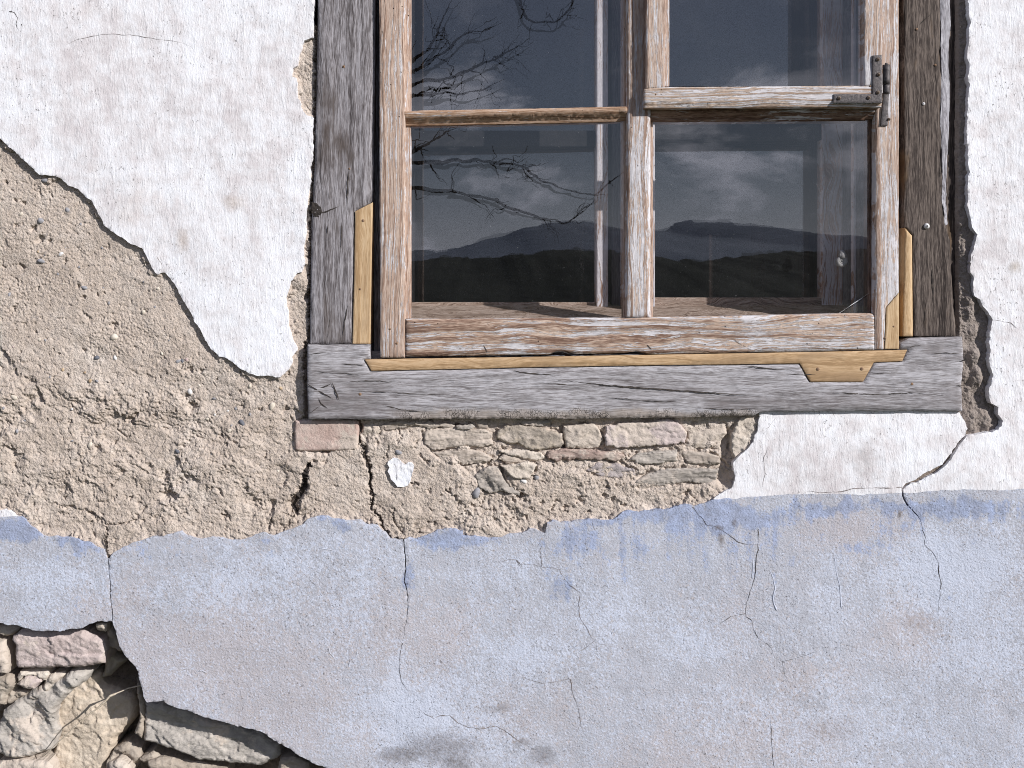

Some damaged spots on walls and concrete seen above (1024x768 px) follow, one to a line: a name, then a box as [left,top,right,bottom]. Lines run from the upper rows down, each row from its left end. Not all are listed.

flaking render [0,25,759,557]
flaking render [954,0,998,434]
crack [293,464,311,511]
crack [358,441,469,685]
crack [502,546,616,653]
crack [693,507,814,675]
crack [803,431,968,611]
spalling [0,621,326,768]